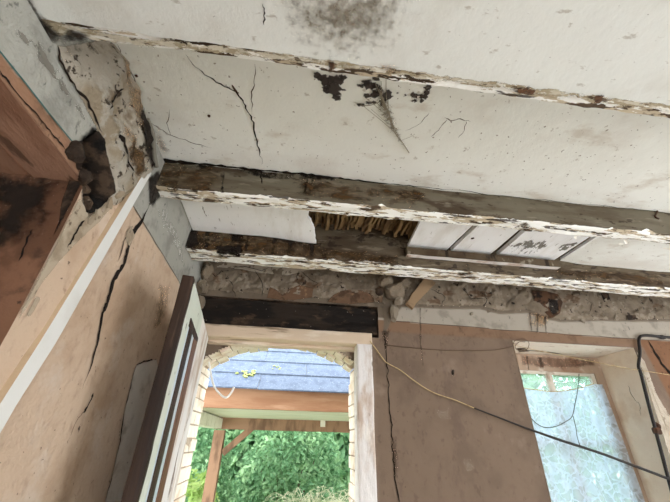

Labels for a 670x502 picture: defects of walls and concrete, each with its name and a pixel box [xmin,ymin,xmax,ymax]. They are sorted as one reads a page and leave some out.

water stain [329,0,377,25]
crack [0,71,66,150]
crack [186,55,262,183]
water stain [314,72,347,101]
peeling [47,21,670,110]
water stain [357,77,431,107]
water stain [0,176,51,245]
spalling [20,131,125,317]
peeling [509,240,547,254]
crack [71,203,150,434]
flaking render [206,258,670,323]
crack [382,331,400,502]